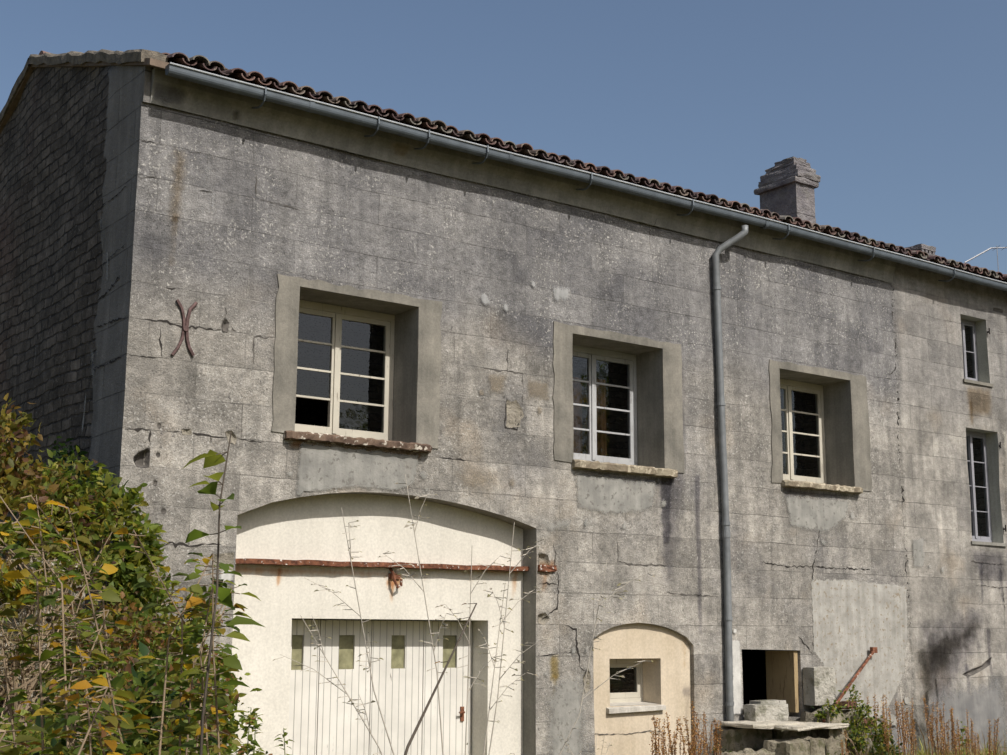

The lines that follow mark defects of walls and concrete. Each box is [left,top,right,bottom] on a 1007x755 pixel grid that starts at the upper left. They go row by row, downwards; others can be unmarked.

crack [93,245,272,371]
spalling [133,447,150,468]
crack [159,541,221,549]
crack [762,530,870,580]
crack [540,544,585,671]